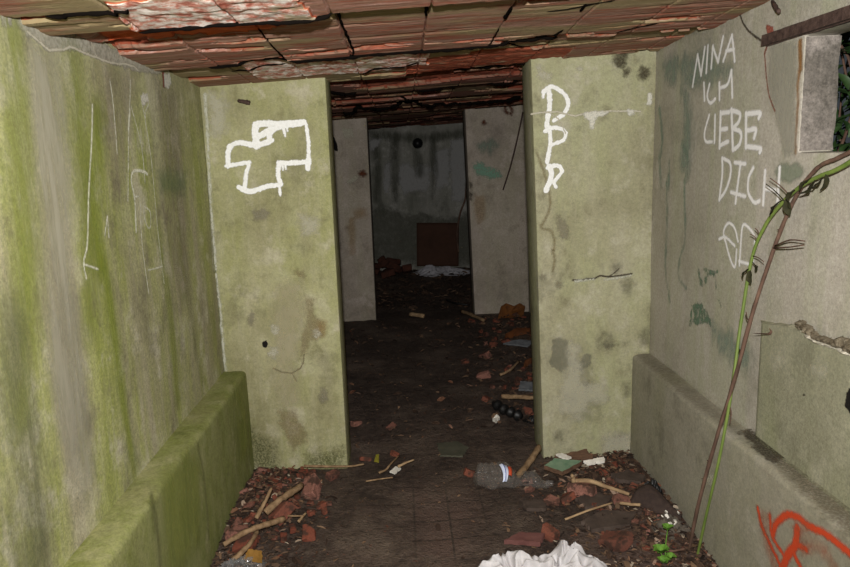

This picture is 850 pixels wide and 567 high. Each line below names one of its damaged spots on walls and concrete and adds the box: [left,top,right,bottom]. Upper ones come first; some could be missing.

crack [27,30,139,72]
crack [45,9,129,20]
crack [138,0,641,134]
spalling [330,46,578,106]
damp [614,53,629,74]
crack [740,14,761,41]
corrosion [794,39,802,154]
damp [203,94,227,371]
damp [34,54,89,479]
damp [690,303,711,325]
spalling [795,320,850,357]
damp [550,338,608,420]